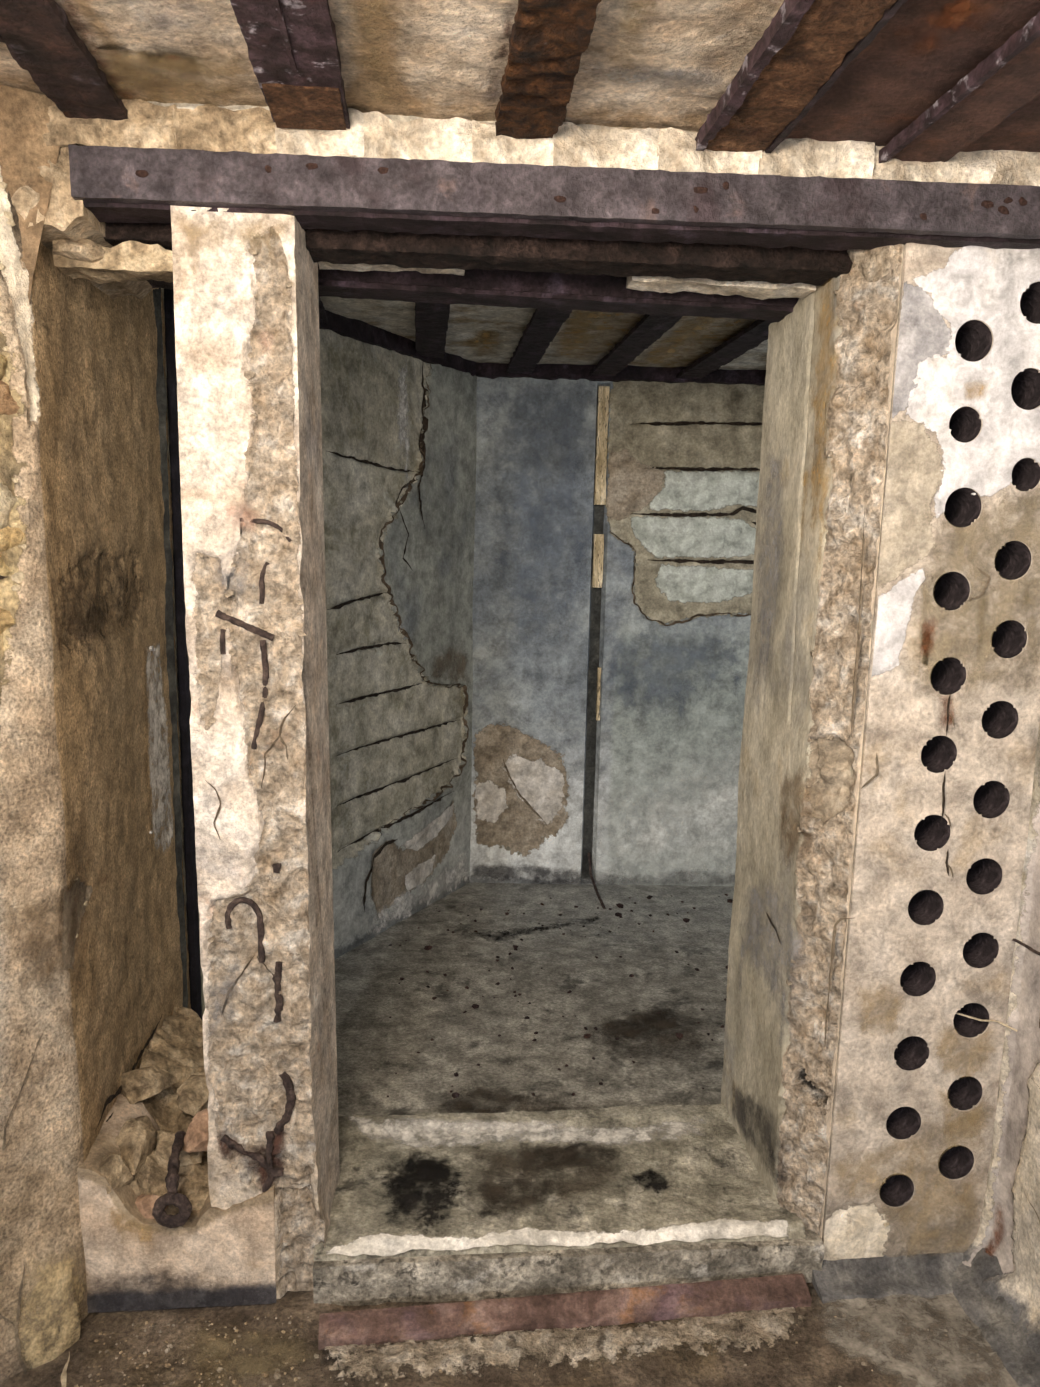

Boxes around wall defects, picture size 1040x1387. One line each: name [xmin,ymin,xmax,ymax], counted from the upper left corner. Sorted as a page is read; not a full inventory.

spalling [0,167,41,703]
crack [395,366,429,571]
spalling [191,227,1040,1293]
crack [363,839,397,912]
rust [218,1131,285,1186]
water stain [377,1142,619,1234]
water stain [632,1170,669,1194]